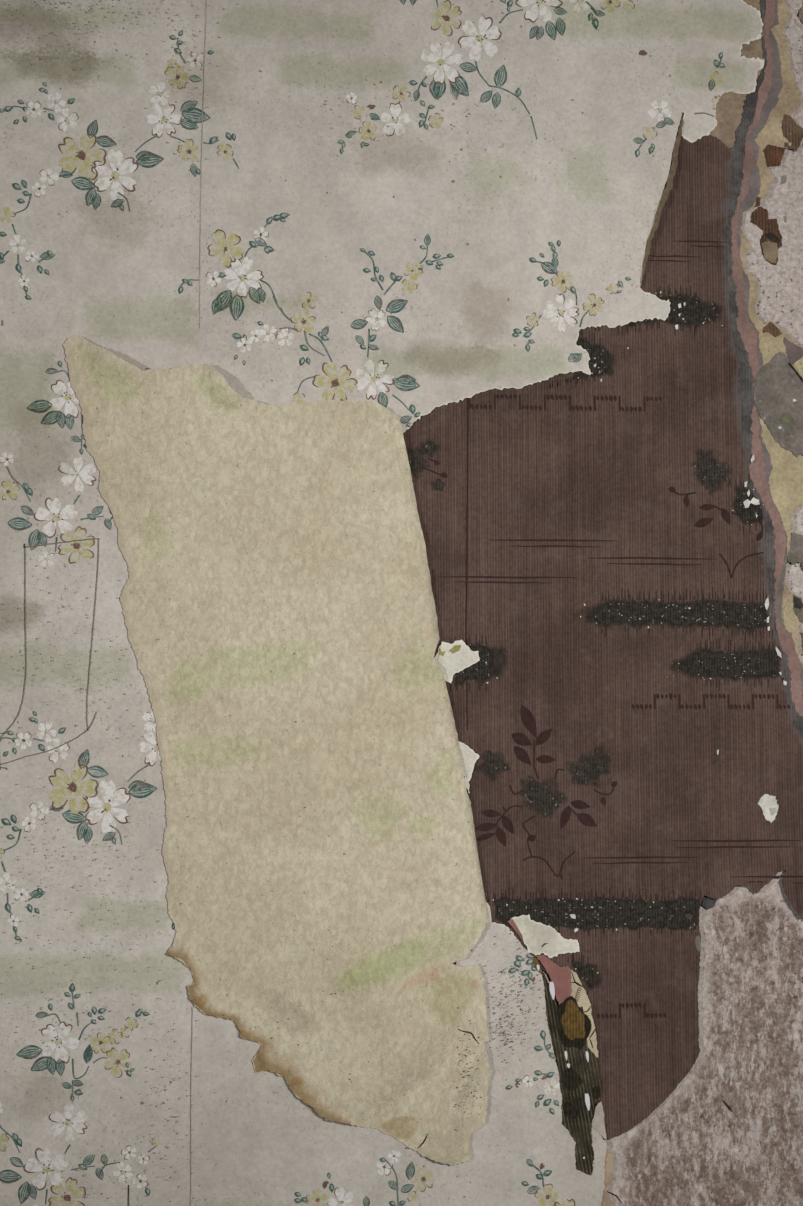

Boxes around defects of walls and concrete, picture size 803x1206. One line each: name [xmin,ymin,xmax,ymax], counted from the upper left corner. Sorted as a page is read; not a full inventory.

spalling [753,322,803,457]
spalling [787,533,803,569]
damp [580,587,784,691]
damp [454,888,701,1115]